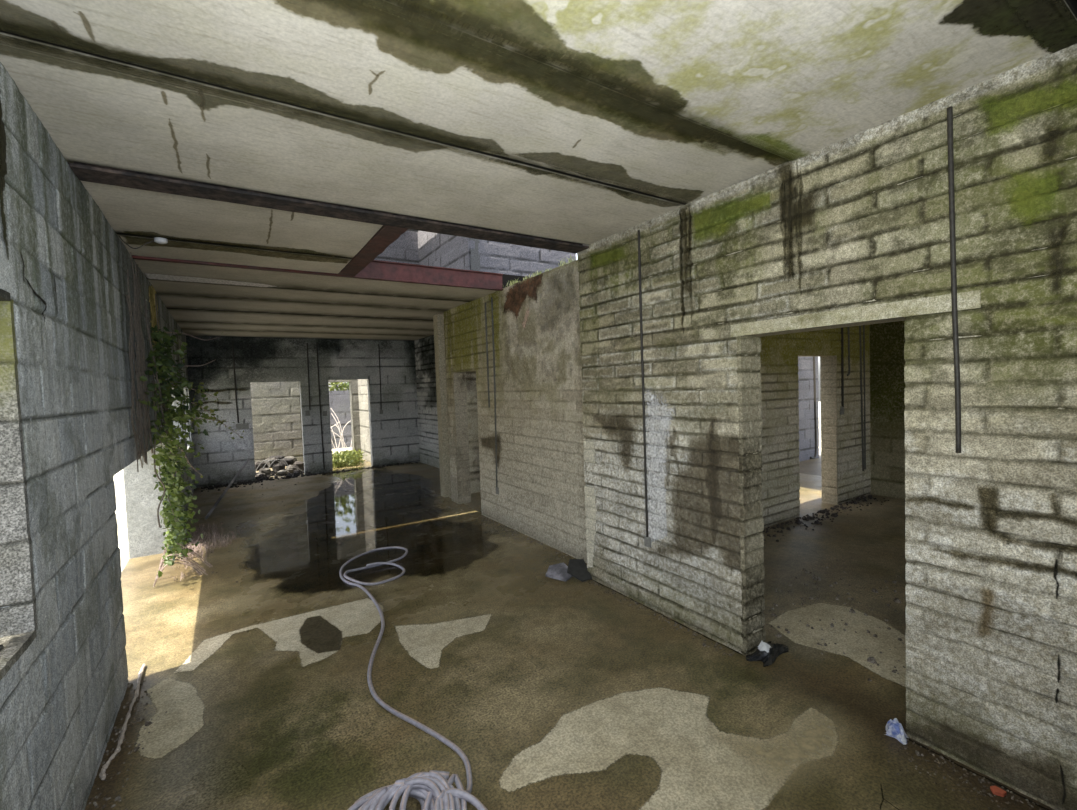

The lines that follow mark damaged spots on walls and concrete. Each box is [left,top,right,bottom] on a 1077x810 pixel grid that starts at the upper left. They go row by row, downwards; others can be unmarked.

water stain [0,19,186,85]
water stain [275,0,359,22]
water stain [940,0,1077,53]
water stain [0,91,9,260]
water stain [202,73,631,195]
water stain [366,0,815,295]
water stain [1042,129,1060,157]
water stain [644,390,672,542]
crack [906,738,1066,810]